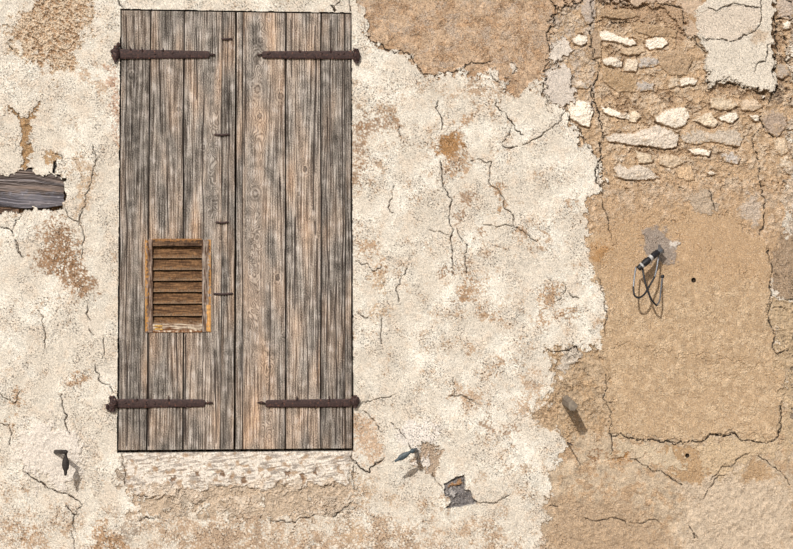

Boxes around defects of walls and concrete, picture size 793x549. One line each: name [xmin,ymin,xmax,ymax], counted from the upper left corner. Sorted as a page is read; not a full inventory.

flaking render [3,0,95,74]
crack [366,36,517,82]
crack [495,0,643,237]
flaking render [357,0,793,194]
crack [431,161,468,273]
crack [471,159,537,242]
crack [695,0,793,355]
crack [584,370,789,498]
crack [27,473,82,548]
spalling [444,476,476,507]